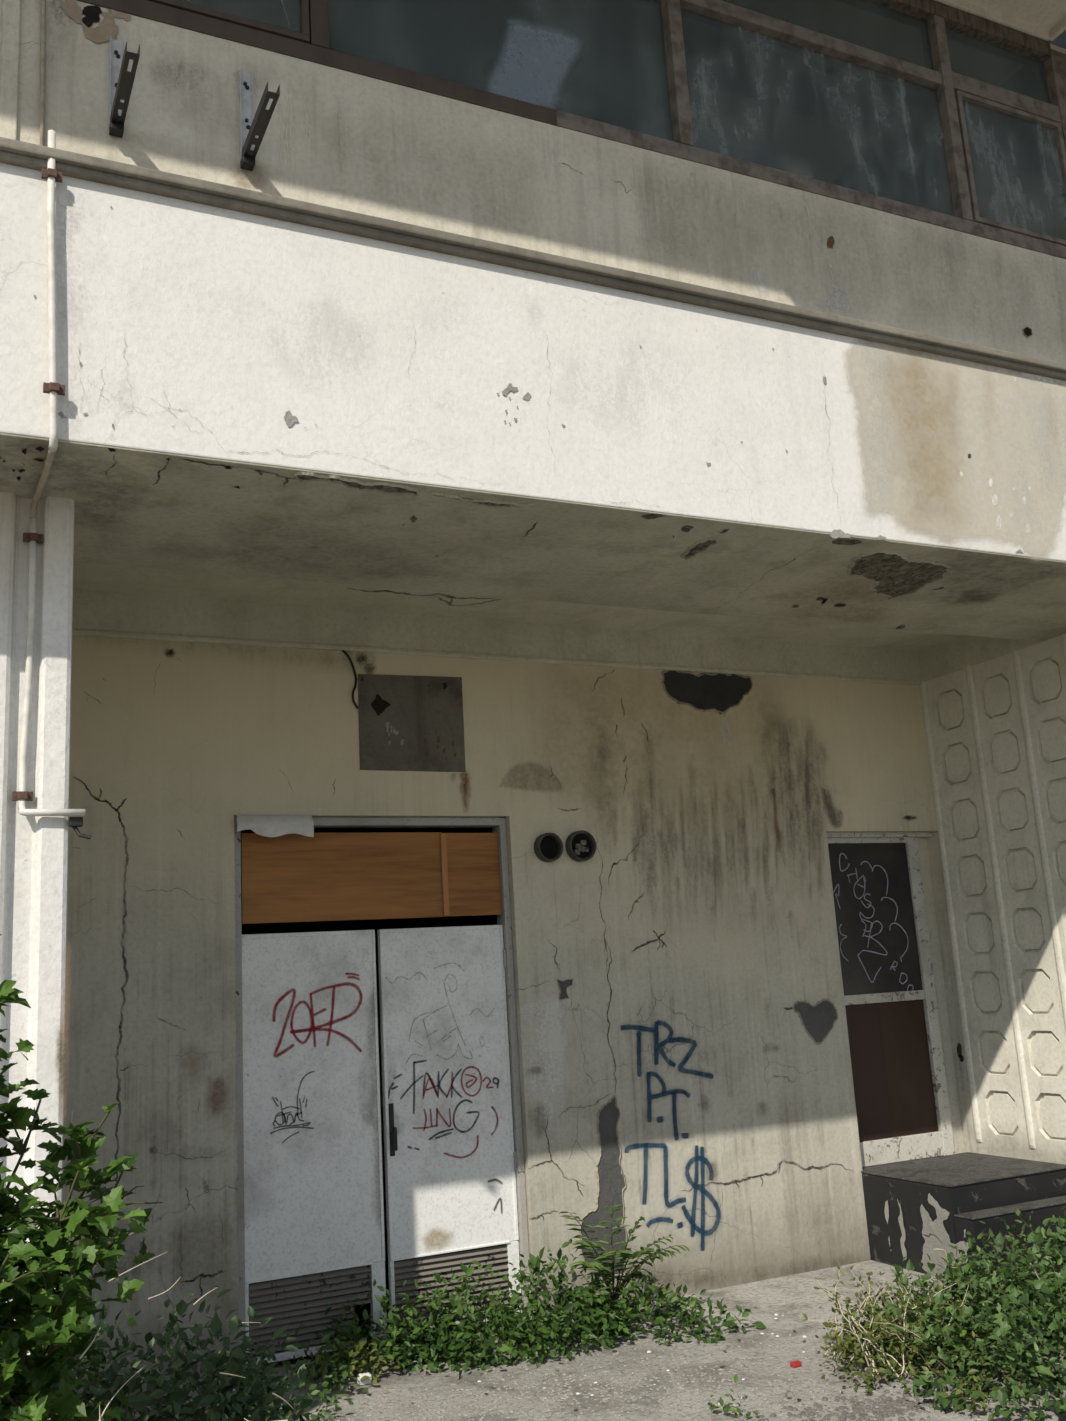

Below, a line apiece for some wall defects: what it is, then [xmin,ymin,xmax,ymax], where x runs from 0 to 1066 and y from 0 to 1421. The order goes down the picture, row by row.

peeling [61,0,131,43]
peeling [497,383,531,424]
leakage [848,341,1066,556]
crack [347,588,502,606]
spalling [830,529,952,600]
flaking render [661,670,753,714]
crack [74,777,128,862]
crack [92,888,188,1185]
crack [682,1161,847,1192]
peeling [884,1193,969,1277]